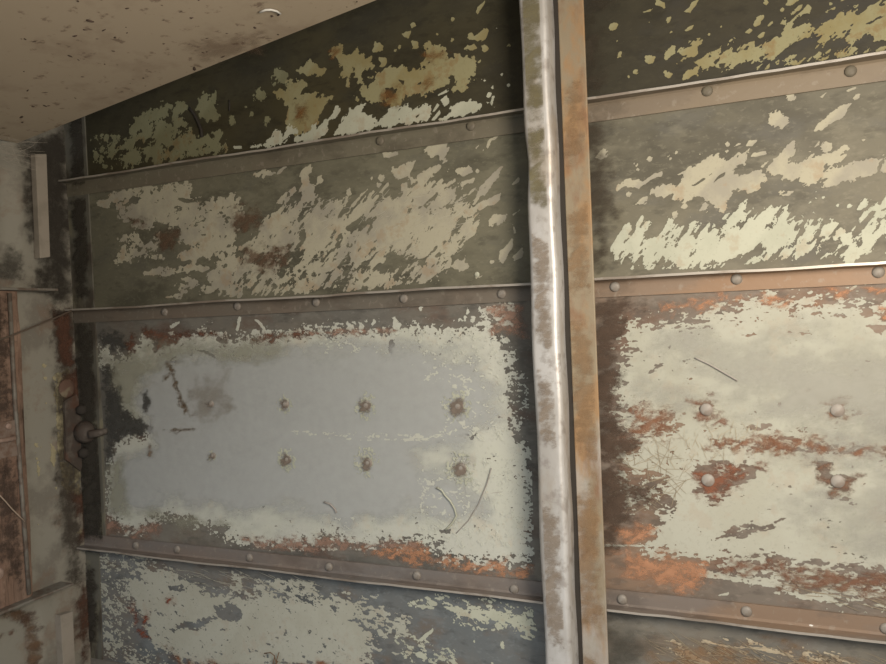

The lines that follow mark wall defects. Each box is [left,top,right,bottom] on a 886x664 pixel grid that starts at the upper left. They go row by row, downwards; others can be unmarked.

peeling [90,22,497,169]
peeling [97,143,524,299]
rust [486,238,552,349]
peeling [610,87,886,272]
peeling [97,302,535,572]
rust [571,300,708,621]
rust [691,464,745,501]
peeling [603,284,886,613]
rust [705,430,867,498]
peeling [100,553,537,664]
rust [241,537,534,578]
rust [720,559,886,596]